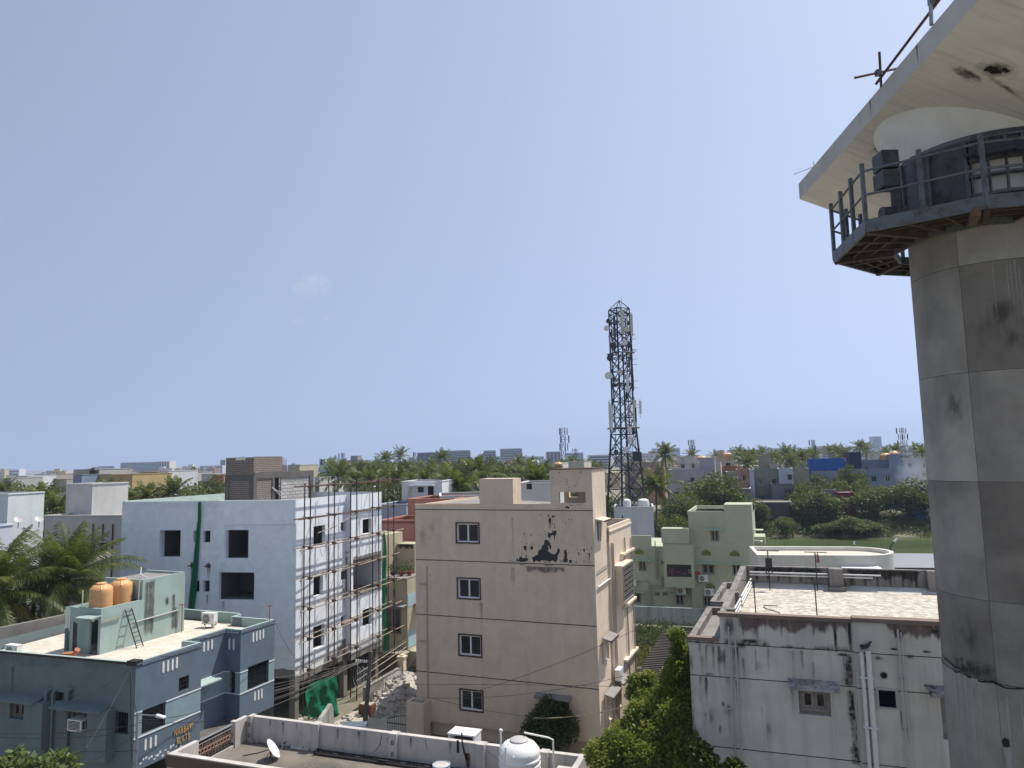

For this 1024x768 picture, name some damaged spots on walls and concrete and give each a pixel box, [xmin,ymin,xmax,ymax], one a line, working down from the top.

peeling [509,504,592,567]
leakage [887,624,940,650]
leakage [705,618,879,764]